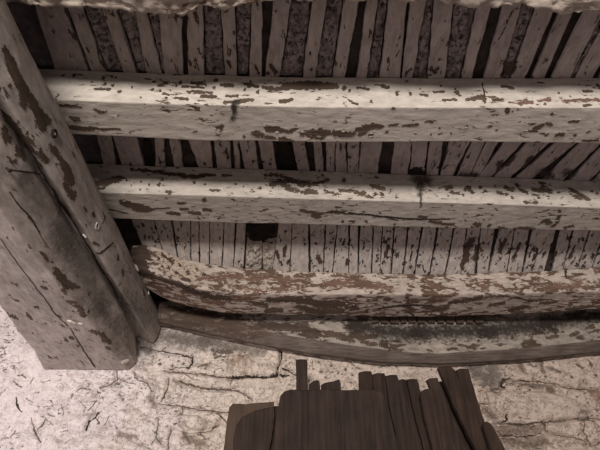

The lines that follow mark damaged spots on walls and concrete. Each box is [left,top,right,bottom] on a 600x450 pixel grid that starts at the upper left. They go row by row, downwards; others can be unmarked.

peeling [151,78,370,105]
peeling [409,85,551,114]
peeling [0,45,77,217]
peeling [242,120,441,142]
peeling [234,163,399,199]
damp [412,175,431,207]
peeling [38,251,90,325]
peeling [130,245,394,345]
peeling [421,278,530,316]
crack [13,347,296,450]
crack [478,378,599,406]
crack [497,414,600,446]